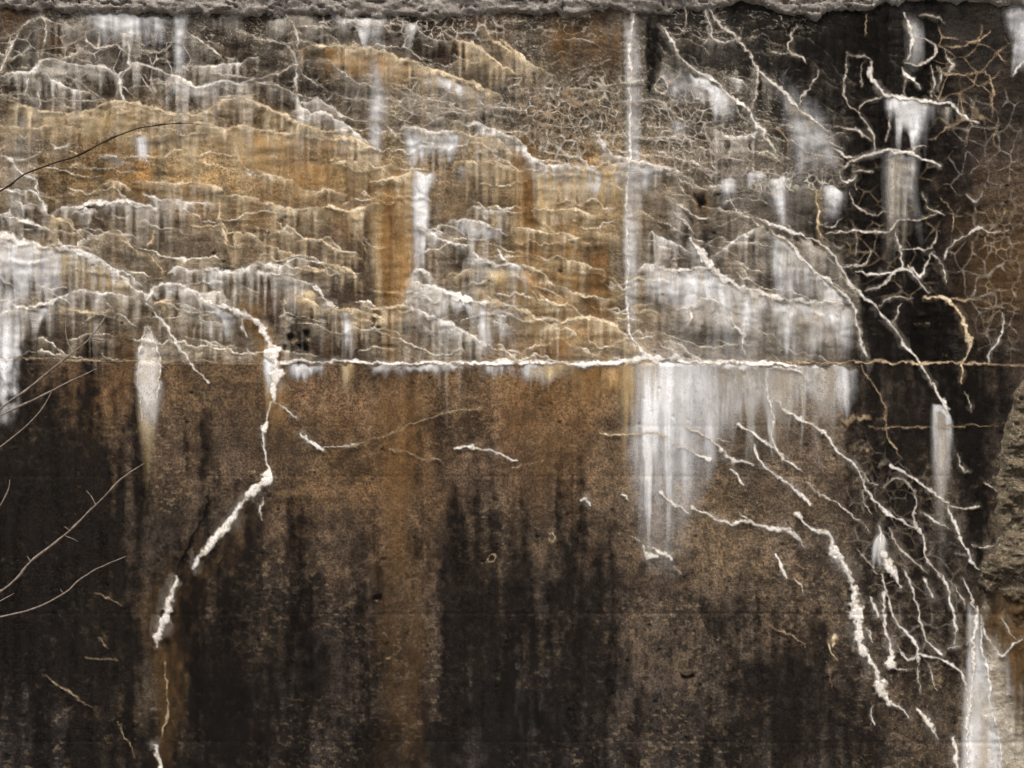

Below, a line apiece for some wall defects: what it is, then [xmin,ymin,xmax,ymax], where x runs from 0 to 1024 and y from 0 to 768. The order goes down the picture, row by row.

crack [0,143,125,228]
efflorescence [97,13,161,40]
efflorescence [2,64,431,255]
crack [0,16,621,159]
corrosion [373,174,417,350]
corrosion [517,152,619,257]
corrosion [553,247,617,353]
water stain [256,0,1010,675]
crack [600,13,1020,724]
spalling [977,379,1024,607]
crack [121,403,544,768]
water stain [952,584,1024,768]